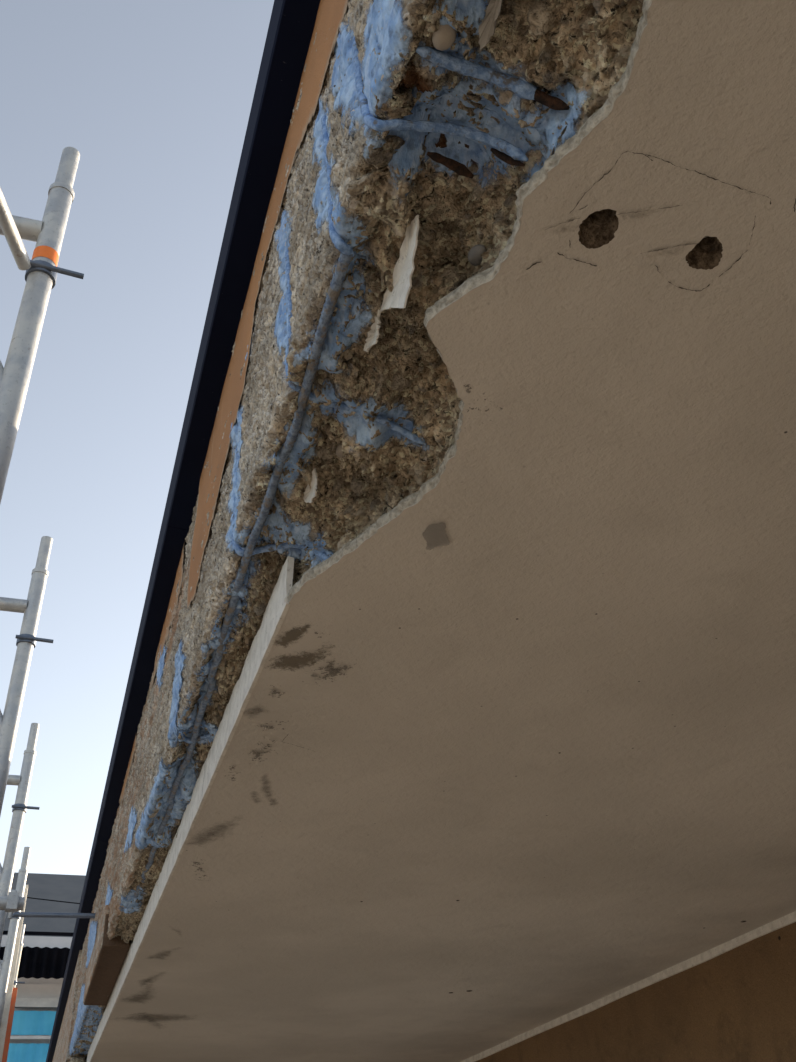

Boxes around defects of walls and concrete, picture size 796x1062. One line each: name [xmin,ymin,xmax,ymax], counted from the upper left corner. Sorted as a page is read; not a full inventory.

corrosion [394,61,433,95]
corrosion [422,132,478,166]
spalling [686,236,723,270]
spalling [70,0,653,1062]
damp [271,625,352,683]